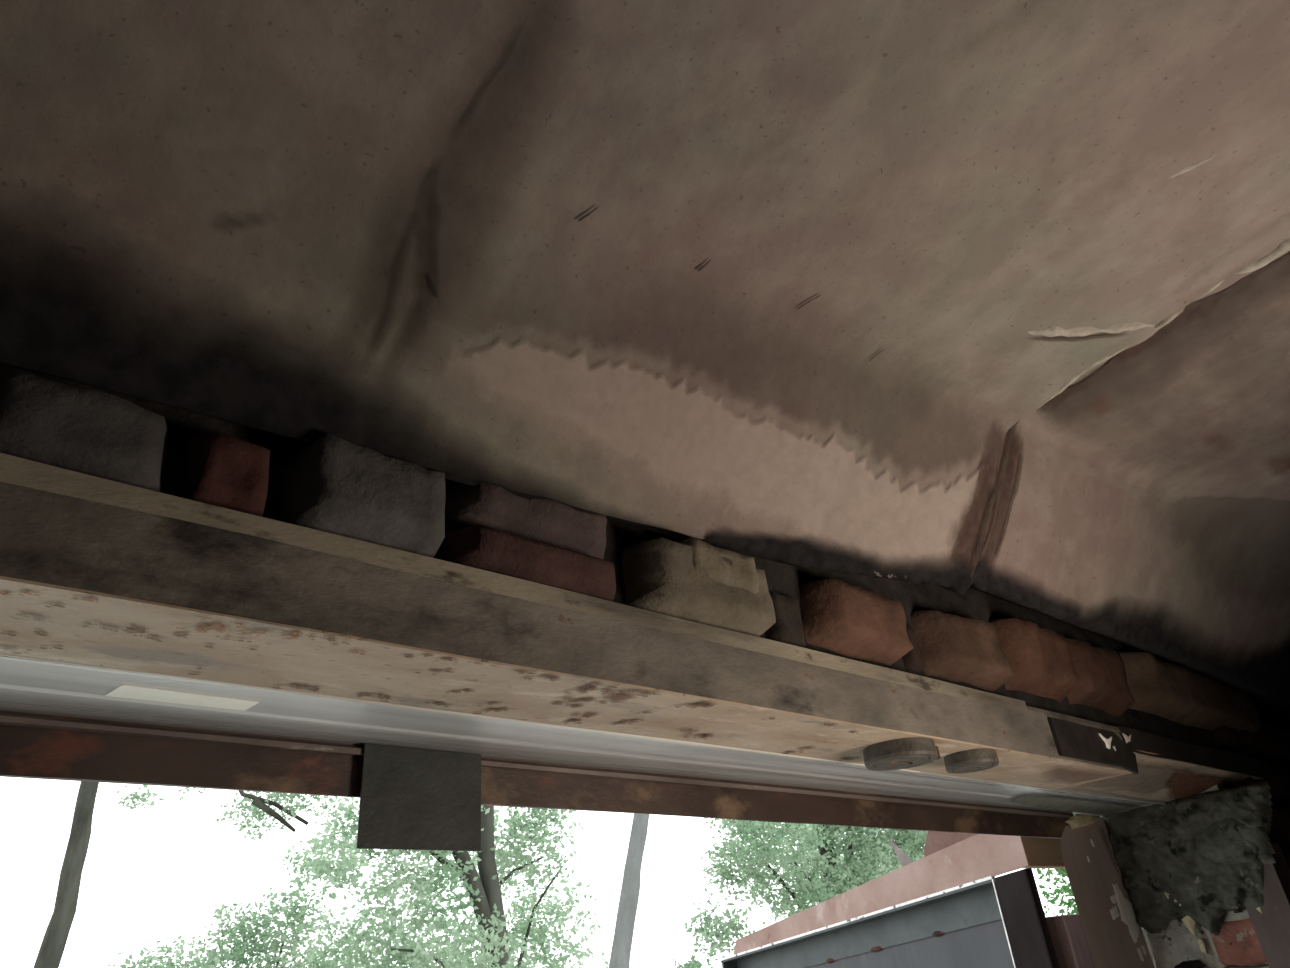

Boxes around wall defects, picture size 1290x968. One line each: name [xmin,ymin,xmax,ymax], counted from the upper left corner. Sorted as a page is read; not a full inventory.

leakage [454,341,986,566]
peeling [1110,883,1147,961]